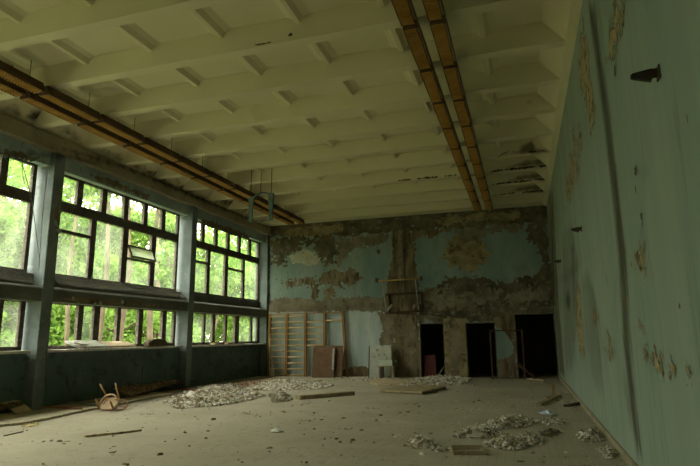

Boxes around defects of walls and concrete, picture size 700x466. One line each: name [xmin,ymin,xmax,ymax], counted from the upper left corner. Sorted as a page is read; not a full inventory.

leakage [490,142,547,196]
peeling [564,15,596,209]
spalling [268,225,555,378]